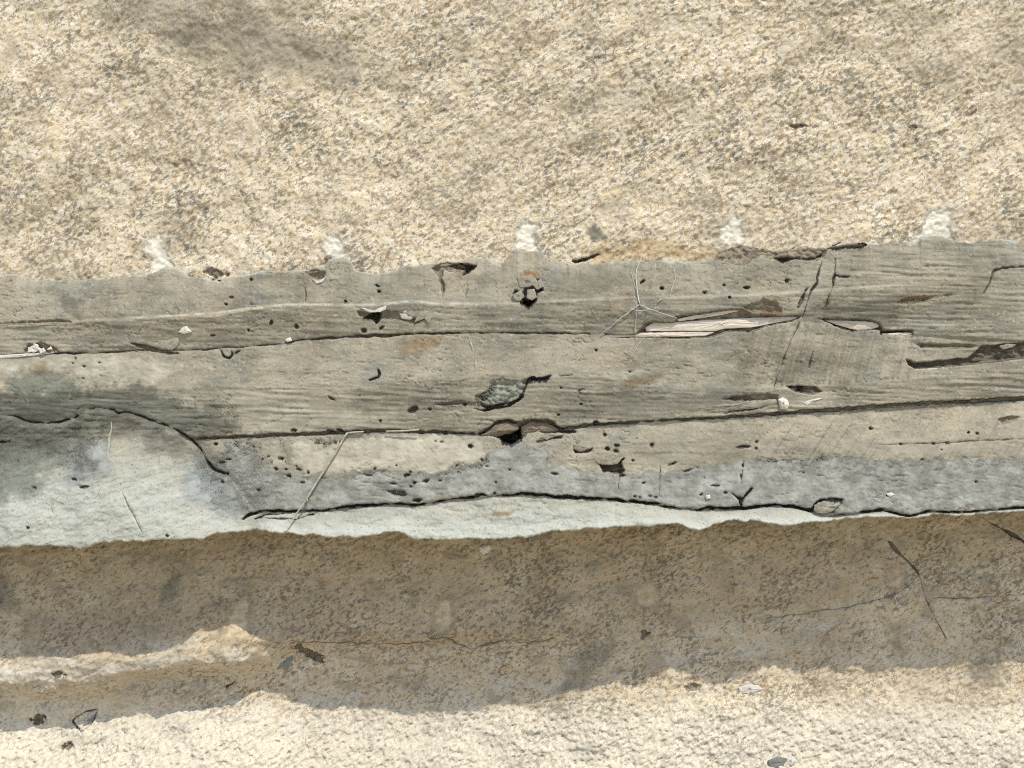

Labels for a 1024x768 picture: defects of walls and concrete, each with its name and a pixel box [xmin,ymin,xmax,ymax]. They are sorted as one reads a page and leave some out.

spalling [512,275,544,309]
spalling [606,285,802,339]
crack [564,259,1024,430]
crack [8,375,585,474]
spalling [408,376,548,413]
spalling [468,414,633,477]
crack [243,468,1024,542]
crack [766,541,1010,638]